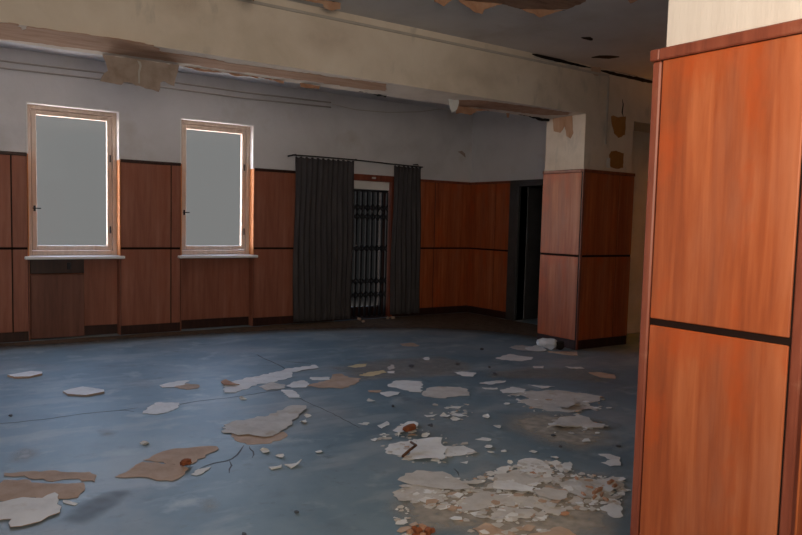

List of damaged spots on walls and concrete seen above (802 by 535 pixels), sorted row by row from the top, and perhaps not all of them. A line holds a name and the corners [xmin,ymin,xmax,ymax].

peeling [434,0,586,18]
peeling [611,115,626,138]
peeling [606,151,624,169]